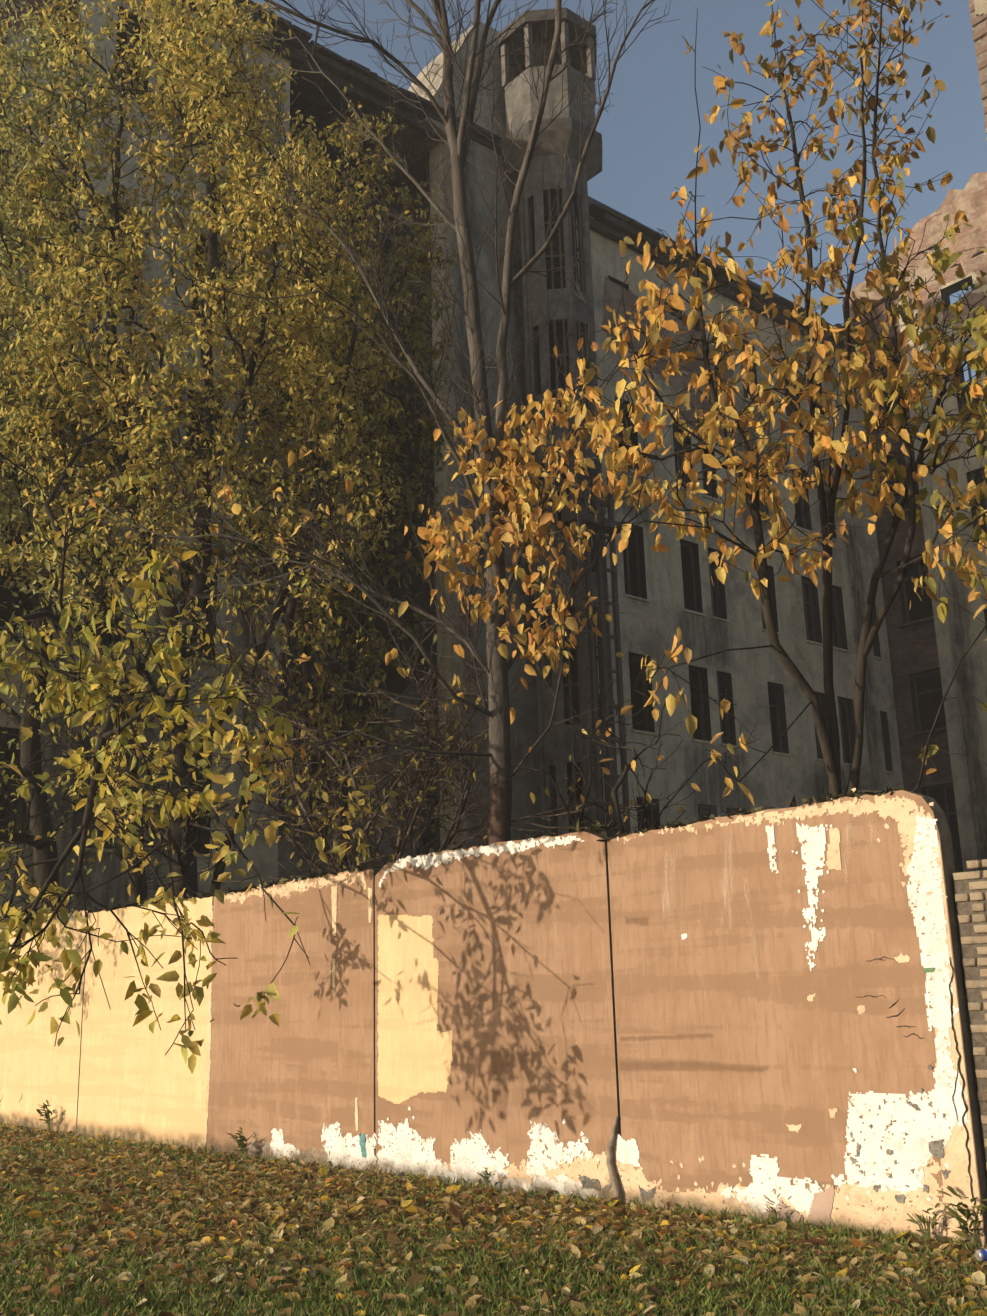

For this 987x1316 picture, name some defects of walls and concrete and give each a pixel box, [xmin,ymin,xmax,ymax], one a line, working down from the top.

flaking render [0,0,61,38]
flaking render [969,4,987,140]
flaking render [899,253,987,328]
flaking render [202,596,585,1145]
peeling [244,788,985,1248]